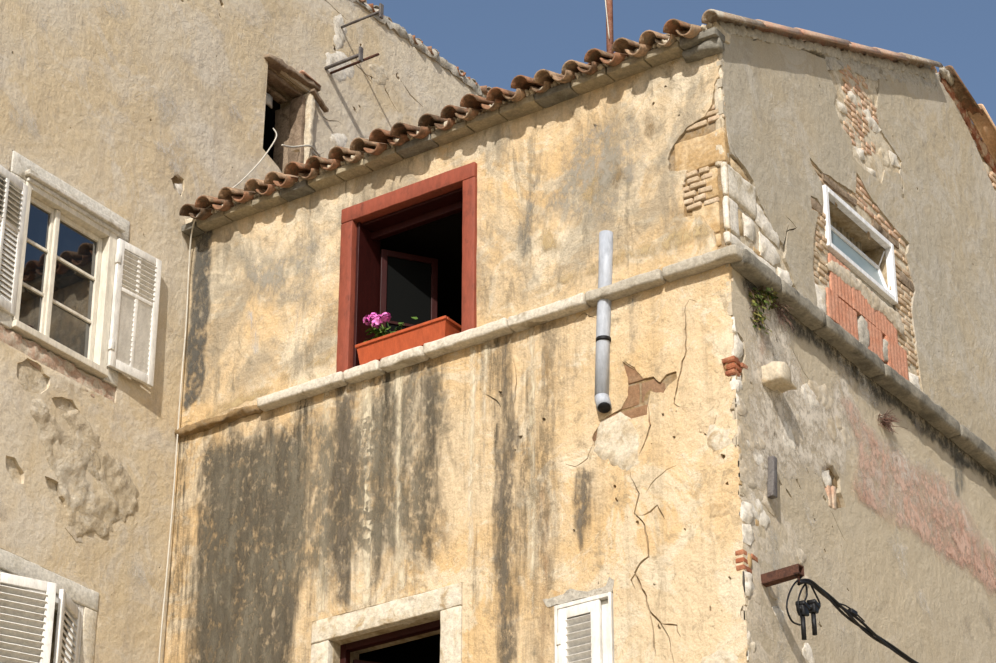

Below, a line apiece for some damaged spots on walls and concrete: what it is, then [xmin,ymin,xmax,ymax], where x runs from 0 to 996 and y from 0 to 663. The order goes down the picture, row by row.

spalling [17,359,75,412]
damp [184,230,212,408]
damp [190,361,446,663]
damp [468,341,488,572]
damp [493,335,519,663]
damp [574,469,590,549]
spalling [605,362,682,426]
crack [636,575,677,644]
spalling [616,53,793,286]
peeling [722,287,996,663]
spalling [811,64,921,390]
spalling [983,162,996,191]